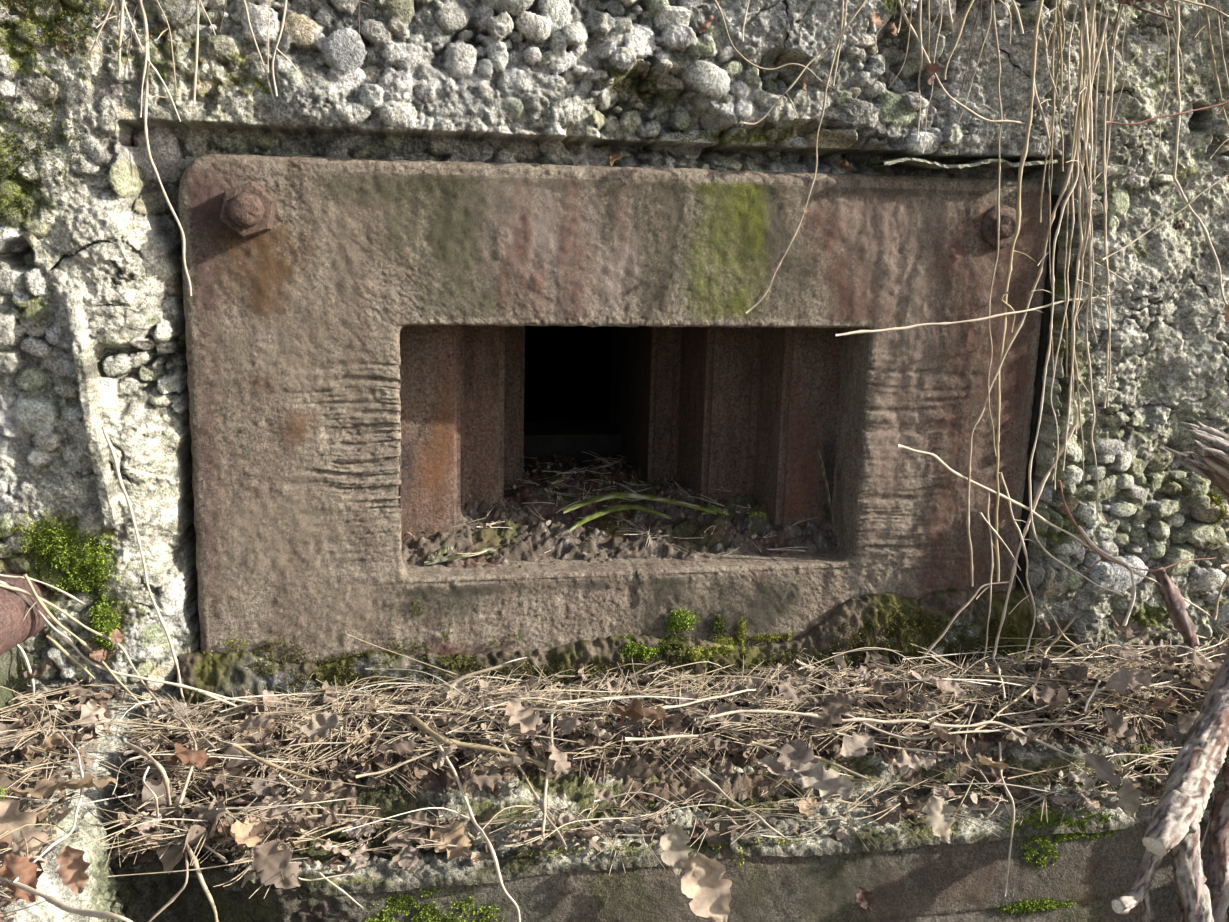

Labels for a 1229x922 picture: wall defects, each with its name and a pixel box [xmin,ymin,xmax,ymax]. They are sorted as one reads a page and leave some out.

crack [749,0,812,63]
rust [187,166,228,328]
rust [906,207,1043,596]
water stain [220,475,341,578]
rust [424,546,505,565]
rust [563,492,729,532]